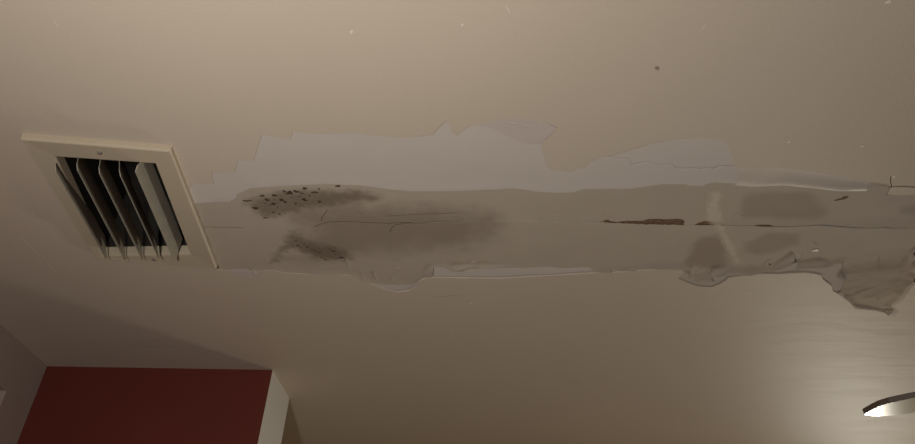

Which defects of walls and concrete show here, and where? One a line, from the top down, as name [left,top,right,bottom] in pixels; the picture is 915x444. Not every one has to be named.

peeling [189,119,738,203]
damp [194,182,915,285]
crack [601,212,772,233]
peeling [759,249,859,309]